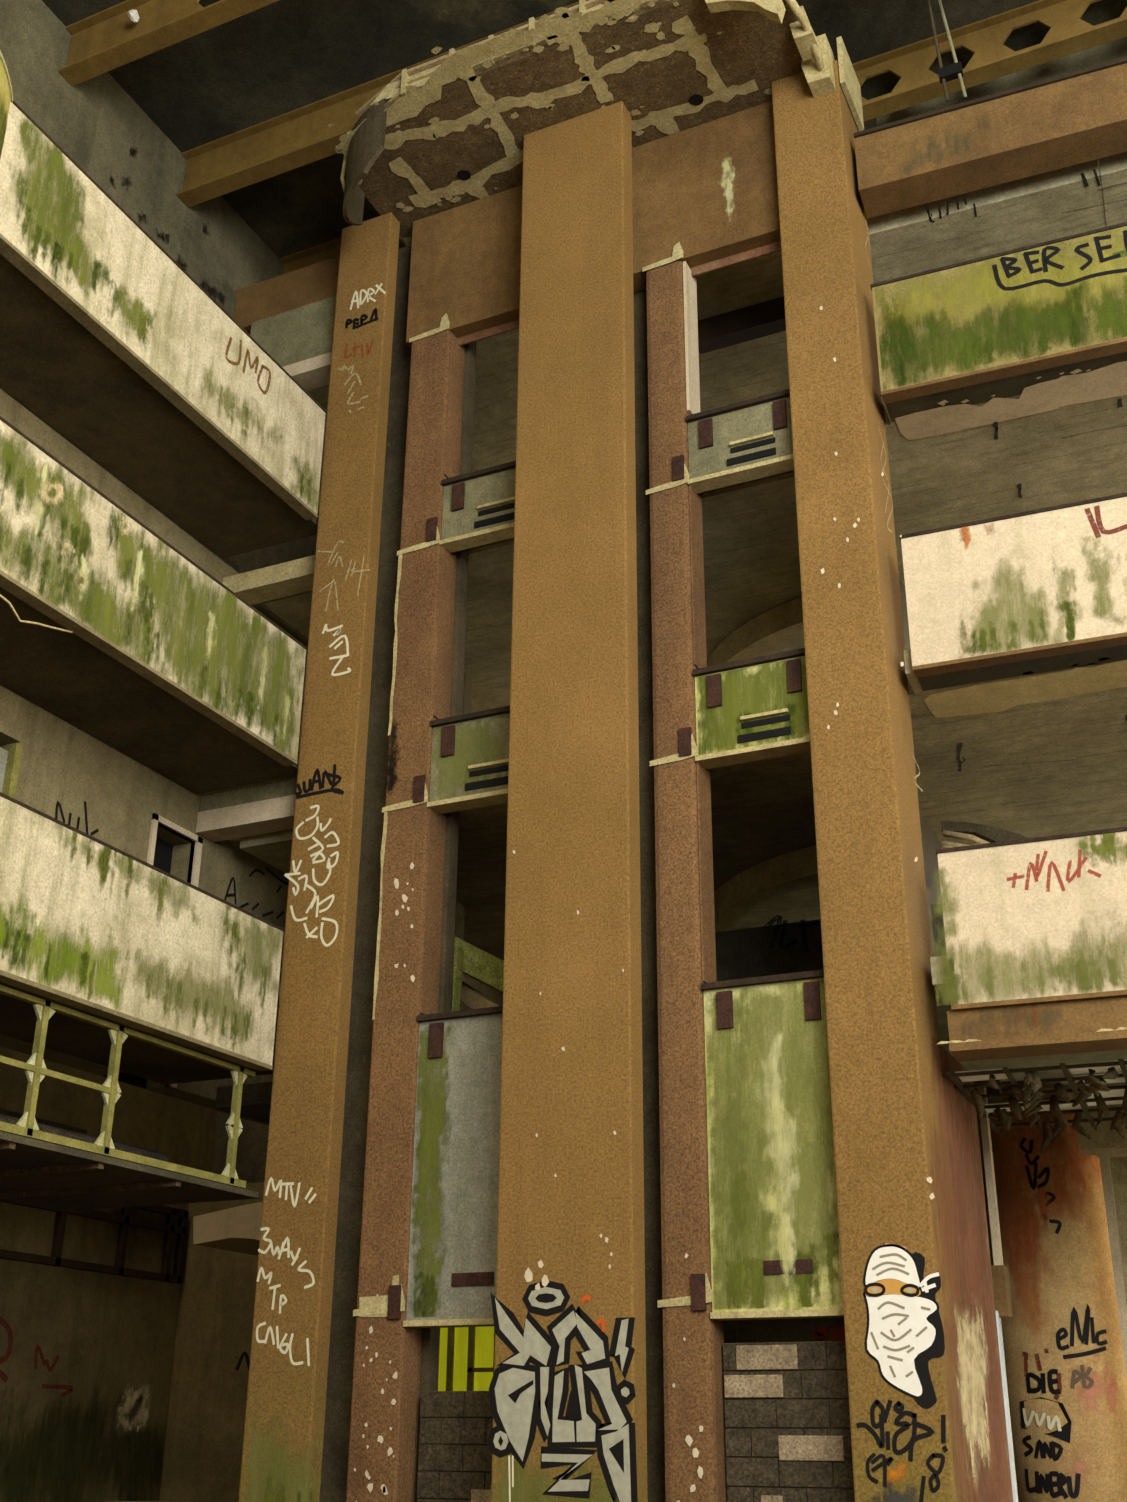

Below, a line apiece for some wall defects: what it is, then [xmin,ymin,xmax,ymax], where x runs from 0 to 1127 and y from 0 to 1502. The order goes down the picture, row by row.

peeling [328,0,772,212]
damp [18,182,72,277]
damp [200,281,224,304]
damp [204,372,277,438]
damp [5,464,89,604]
damp [124,551,160,659]
damp [202,613,290,747]
damp [961,619,1045,651]
damp [71,831,133,895]
damp [146,905,267,1048]
damp [766,1036,838,1306]
rust [992,1115,1098,1270]